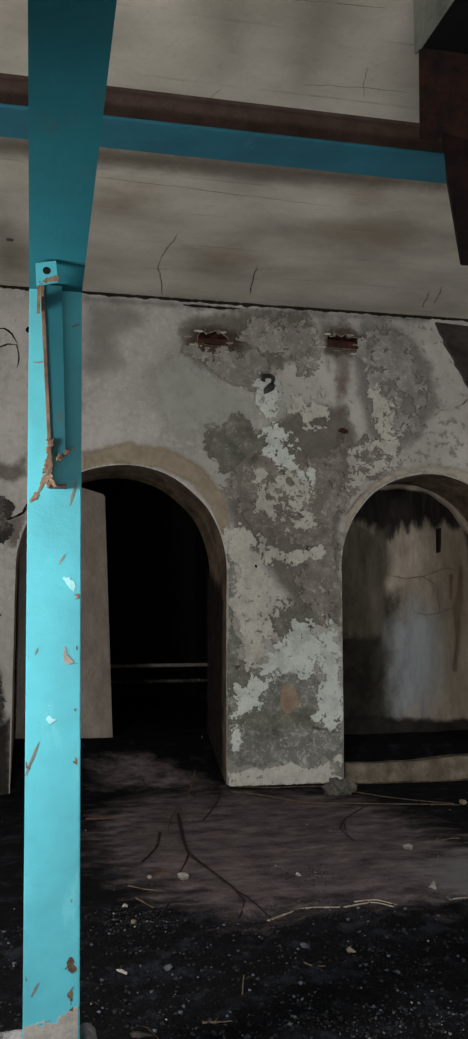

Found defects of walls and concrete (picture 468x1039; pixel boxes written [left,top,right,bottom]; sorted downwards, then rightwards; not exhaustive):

crack [0,284,29,292]
crack [82,231,468,322]
damp [0,461,25,480]
corrosion [42,438,75,488]
damp [258,407,354,475]
damp [83,443,468,721]
peeling [180,312,437,786]
peeling [63,646,77,665]